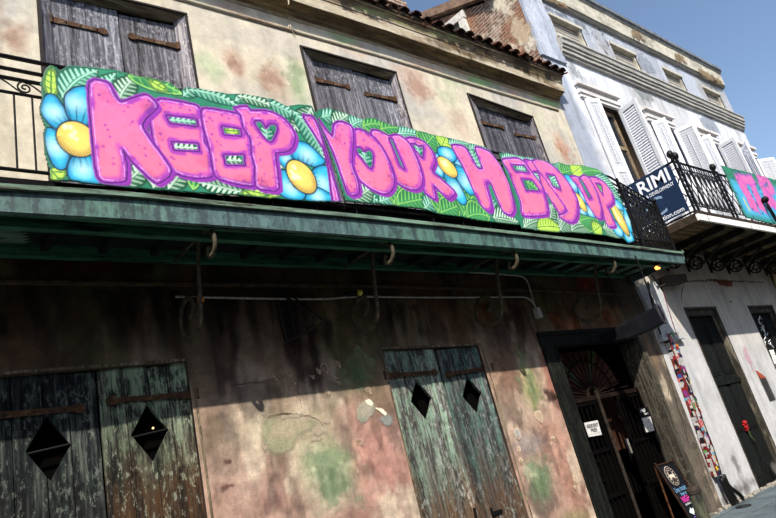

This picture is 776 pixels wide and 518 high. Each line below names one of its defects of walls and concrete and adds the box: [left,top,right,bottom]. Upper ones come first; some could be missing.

flaking render [491,0,535,53]
flaking render [356,388,392,425]
flaking render [261,413,329,453]